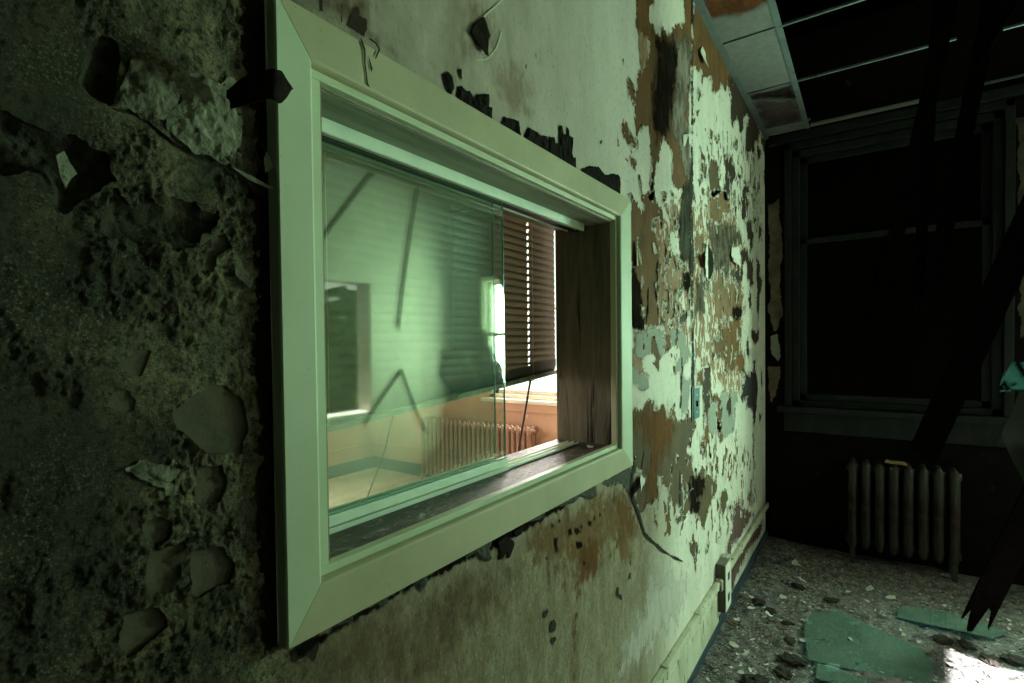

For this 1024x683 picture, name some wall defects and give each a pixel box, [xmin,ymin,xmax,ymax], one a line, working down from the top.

spalling [77,35,121,110]
spalling [0,110,231,272]
crack [108,104,268,198]
spalling [172,0,293,655]
peeling [442,0,765,592]
damp [427,554,475,581]
damp [490,490,638,586]
crack [631,451,683,562]
crack [679,472,691,514]
damp [689,474,705,514]
damp [294,583,414,656]
damp [618,564,687,678]